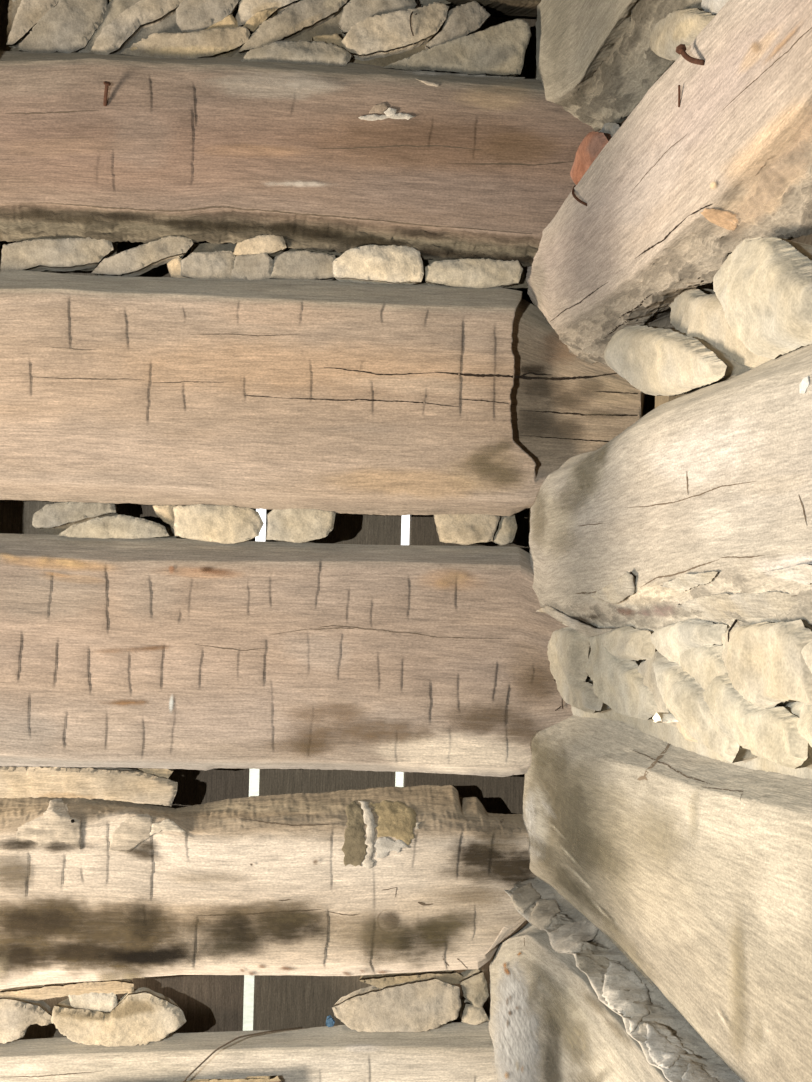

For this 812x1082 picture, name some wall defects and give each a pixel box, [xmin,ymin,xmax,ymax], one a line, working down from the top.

crack [726,28,811,107]
crack [636,204,712,258]
crack [603,294,652,339]
crack [37,367,641,442]
crack [643,555,763,586]
rust [637,743,670,781]
peeling [342,800,422,869]
damp [0,948,36,973]
damp [55,946,188,980]
damp [201,942,247,956]
flaking render [504,877,743,1082]
damp [543,1038,559,1082]